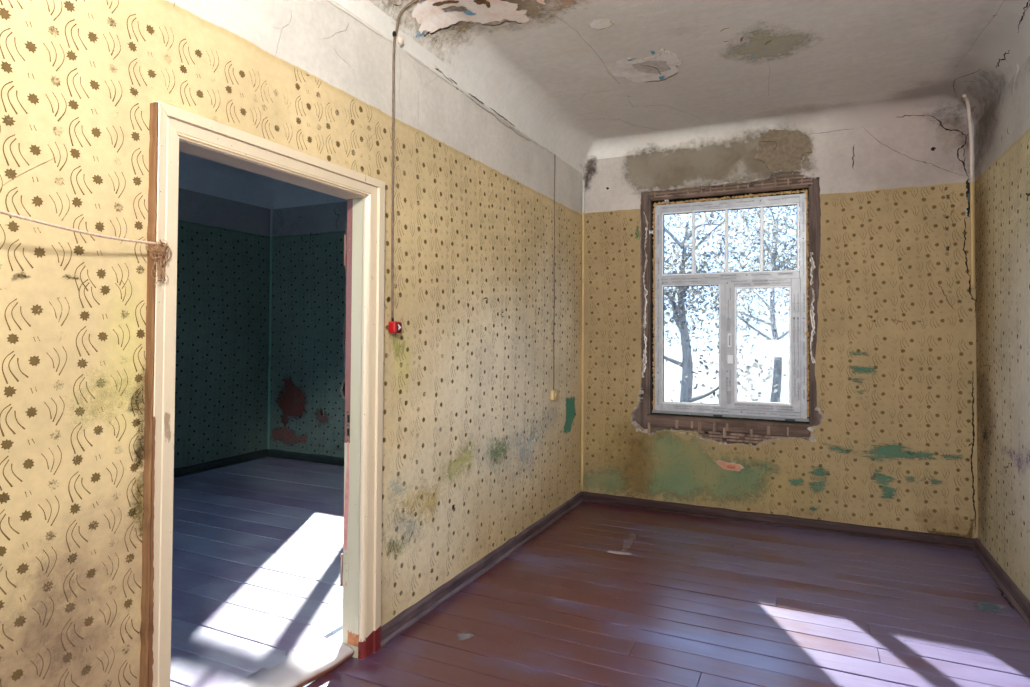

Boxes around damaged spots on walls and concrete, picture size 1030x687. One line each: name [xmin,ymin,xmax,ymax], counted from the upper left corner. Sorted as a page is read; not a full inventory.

water stain [432,21,490,43]
peeling [410,0,530,38]
water stain [501,0,547,18]
peeling [608,49,683,83]
crack [953,0,1030,91]
flaking render [654,129,820,192]
crack [963,218,976,318]
flaking render [631,212,823,447]
peeling [852,352,875,394]
peeling [272,376,328,445]
peeling [788,467,830,491]
peeling [863,443,961,499]